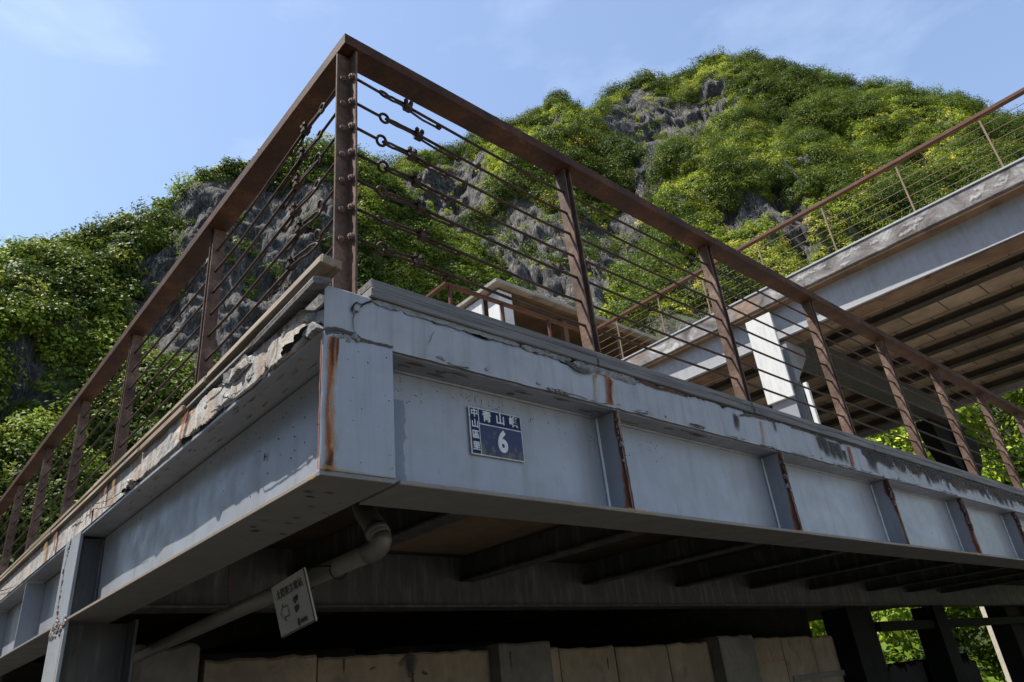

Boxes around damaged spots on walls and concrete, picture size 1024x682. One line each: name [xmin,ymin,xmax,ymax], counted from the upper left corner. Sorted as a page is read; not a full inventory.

spalling [191,313,393,431]
crack [351,301,372,332]
rust [71,335,517,617]
rust [531,374,656,514]
rust [777,451,986,555]